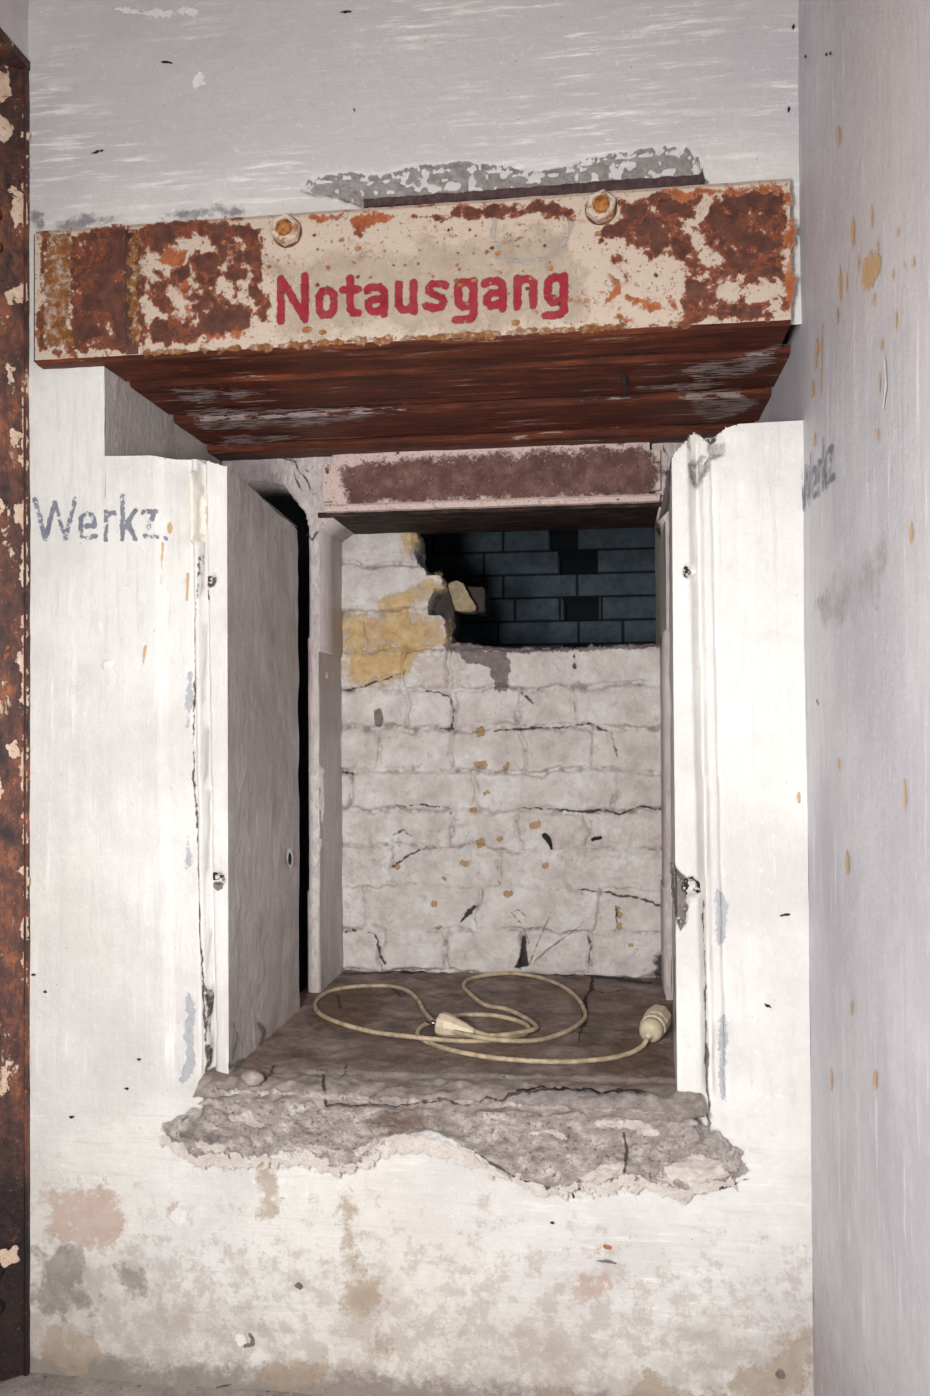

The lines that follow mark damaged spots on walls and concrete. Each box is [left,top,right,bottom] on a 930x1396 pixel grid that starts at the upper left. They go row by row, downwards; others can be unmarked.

flaking render [306,146,709,209]
corrosion [36,181,797,358]
corrosion [337,445,664,504]
peeling [445,642,660,692]
crack [518,805,661,816]
crack [578,888,660,1042]
crack [321,1063,645,1108]
water stain [257,1159,277,1218]
peeling [162,1086,748,1193]
crack [472,1132,637,1190]
water stain [340,1204,379,1318]
water stain [721,1332,811,1396]